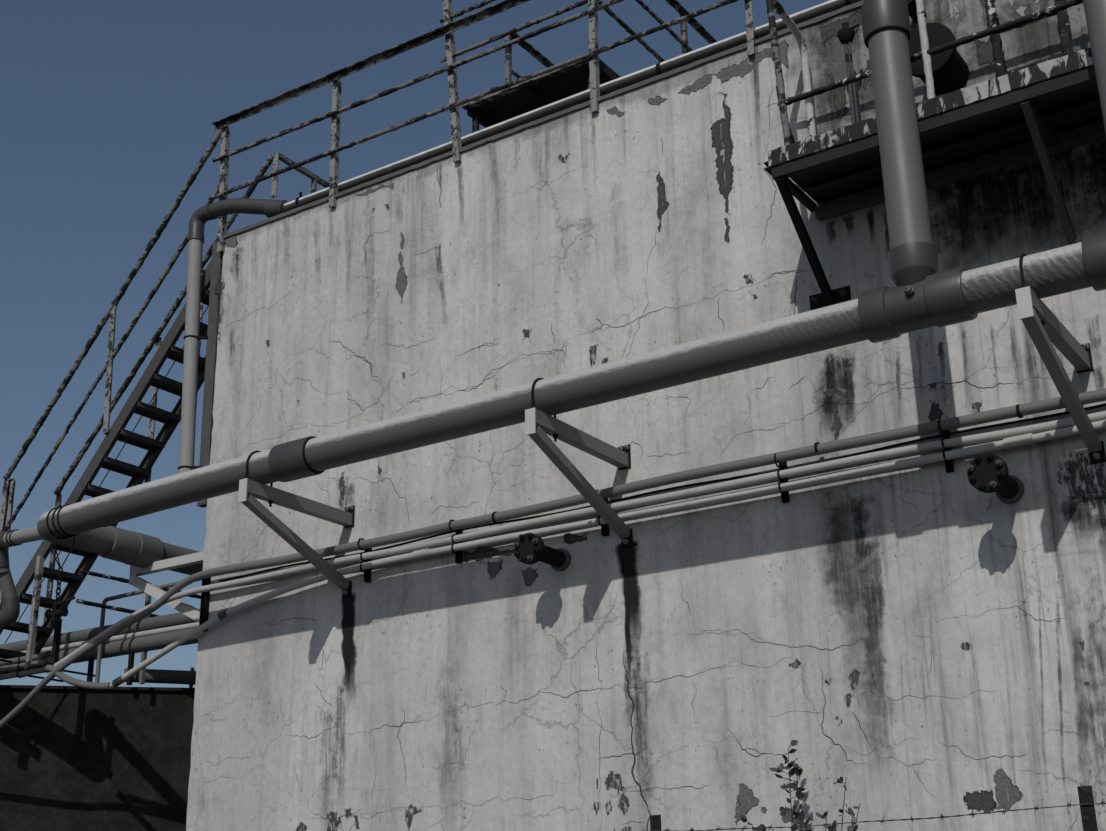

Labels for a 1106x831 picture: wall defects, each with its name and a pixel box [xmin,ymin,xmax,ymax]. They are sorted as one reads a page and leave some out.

peeling [648,95,666,105]
peeling [678,39,789,242]
peeling [656,171,669,232]
peeling [396,232,407,304]
crack [242,231,807,451]
crack [714,377,1051,457]
crack [285,582,1068,831]
spalling [326,807,360,831]
spalling [593,770,631,831]
peeling [734,783,767,825]
peeling [963,768,1023,814]